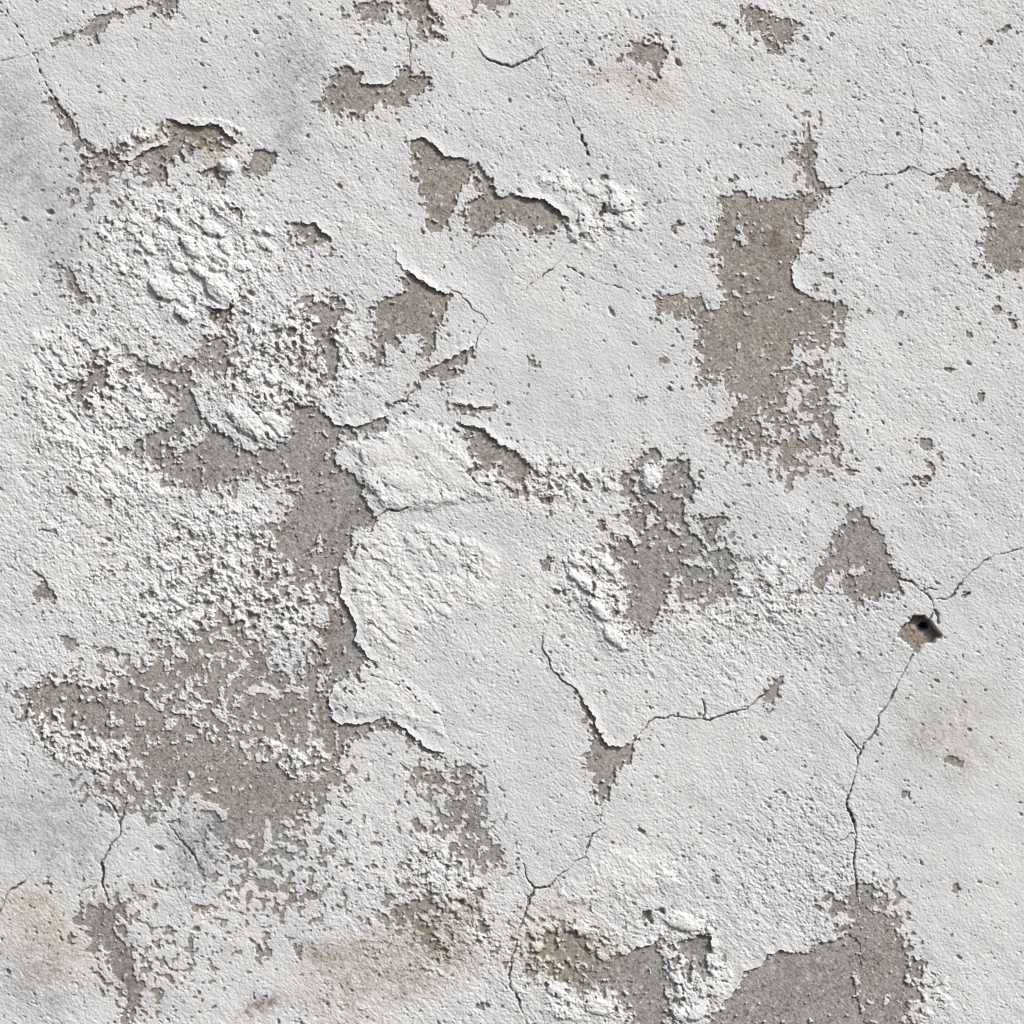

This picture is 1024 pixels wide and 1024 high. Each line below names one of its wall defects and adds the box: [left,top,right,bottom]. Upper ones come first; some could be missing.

peeling [318,66,430,122]
peeling [409,126,573,239]
peeling [367,240,529,484]
peeling [652,147,847,471]
peeling [127,292,505,863]
peeling [596,448,738,636]
peeling [811,507,904,602]
crack [888,548,1022,618]
crack [641,691,768,733]
crack [839,653,914,895]
crack [508,808,602,1023]
peeling [710,888,916,1024]